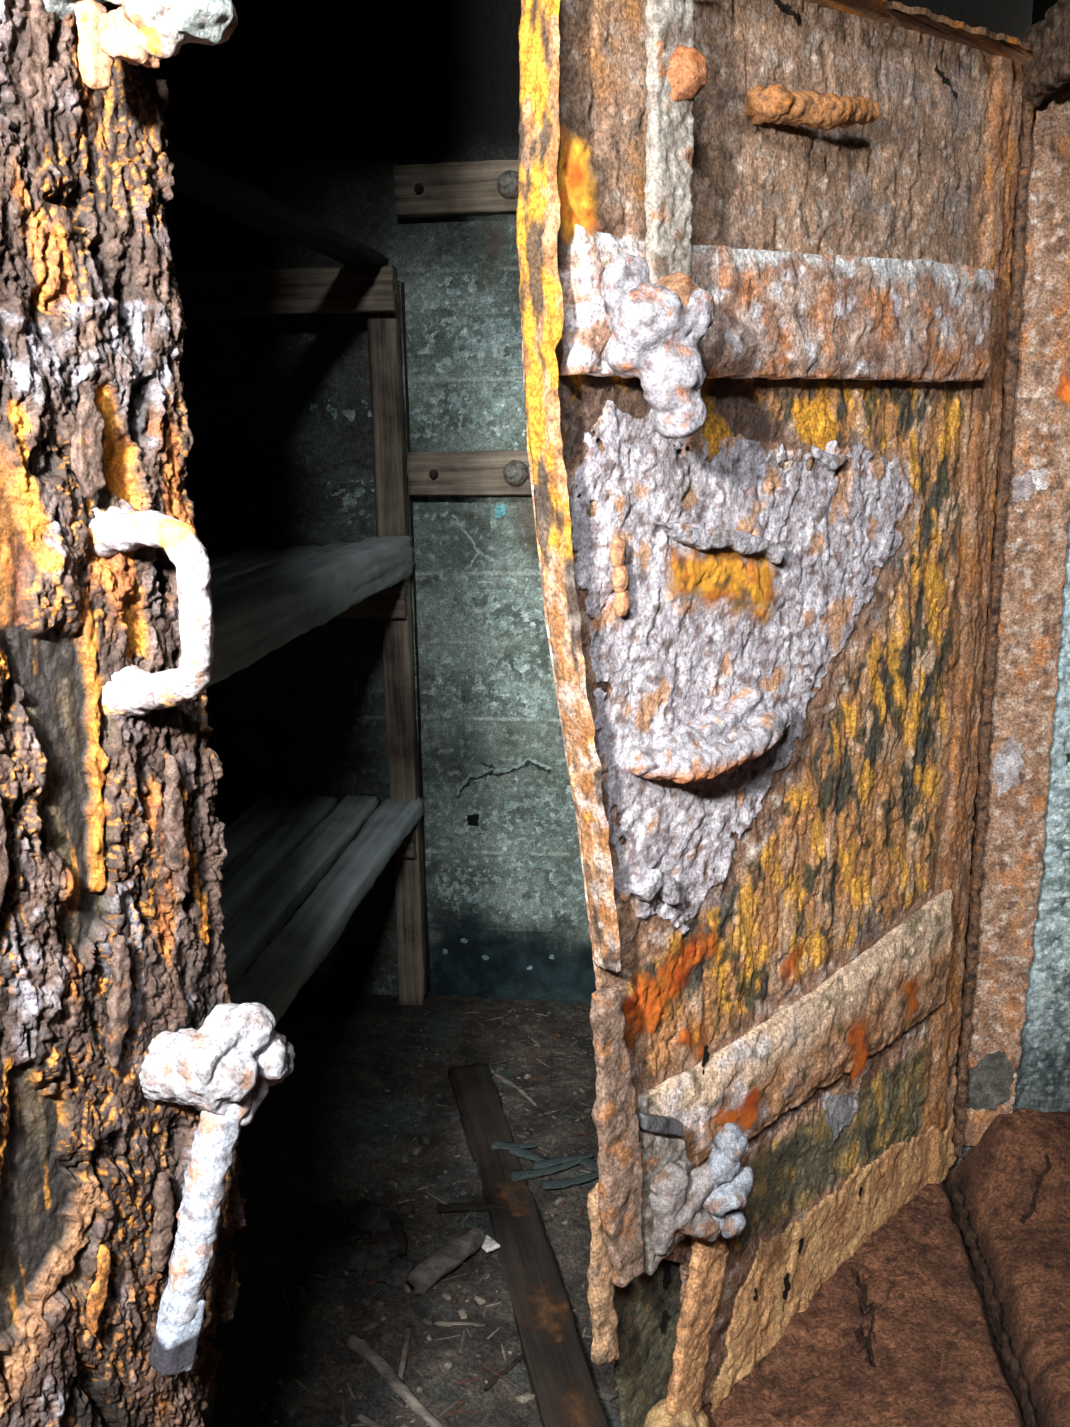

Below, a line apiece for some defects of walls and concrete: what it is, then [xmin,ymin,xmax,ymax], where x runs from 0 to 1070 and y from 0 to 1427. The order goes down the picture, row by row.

corrosion [557,132,597,241]
corrosion [1056,376,1070,404]
corrosion [668,548,774,621]
crack [456,757,552,798]
damp [428,911,597,1004]
corrosion [781,946,802,980]
corrosion [622,933,716,1047]
corrosion [904,982,918,1019]
corrosion [678,1030,704,1060]
corrosion [848,1017,868,1081]
corrosion [715,1088,759,1130]